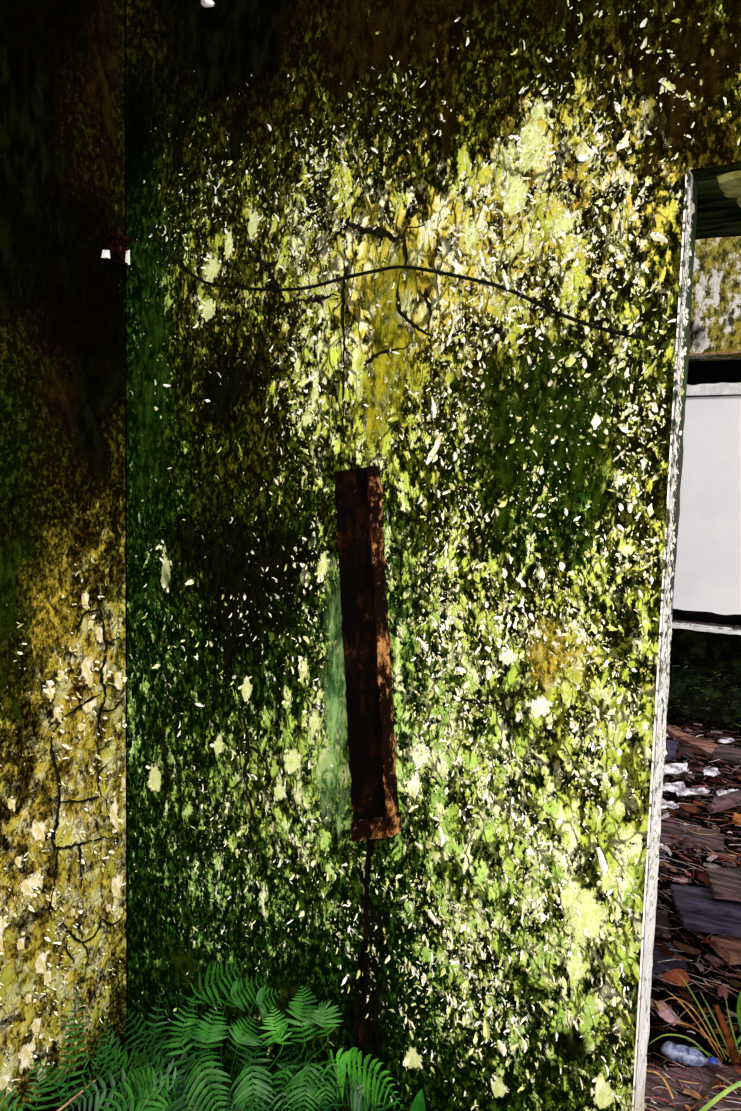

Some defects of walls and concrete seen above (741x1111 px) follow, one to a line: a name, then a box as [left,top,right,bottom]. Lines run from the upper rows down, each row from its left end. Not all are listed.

crack [23,558,124,971]